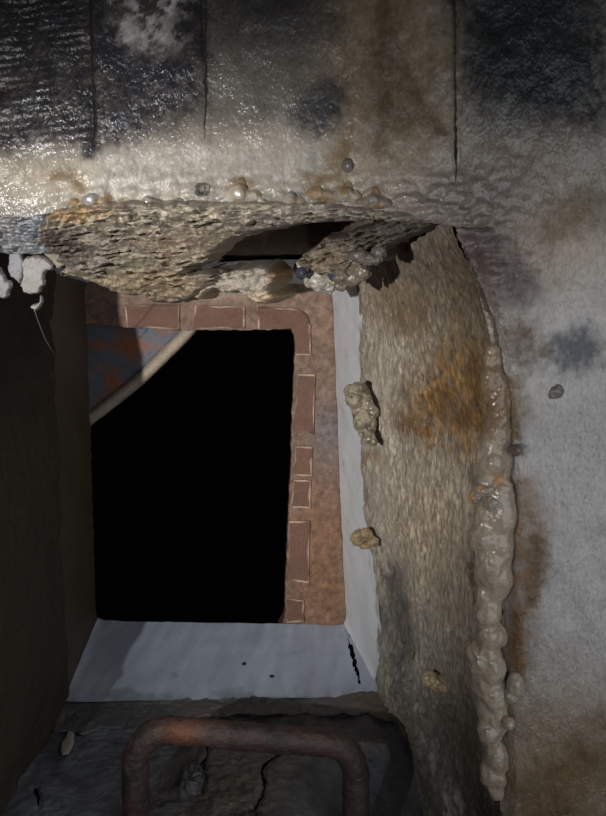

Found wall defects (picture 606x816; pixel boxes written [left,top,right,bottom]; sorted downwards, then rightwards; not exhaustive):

damp [0,0,442,304]
corrosion [399,346,486,453]
damp [465,344,517,801]
crack [250,754,279,816]